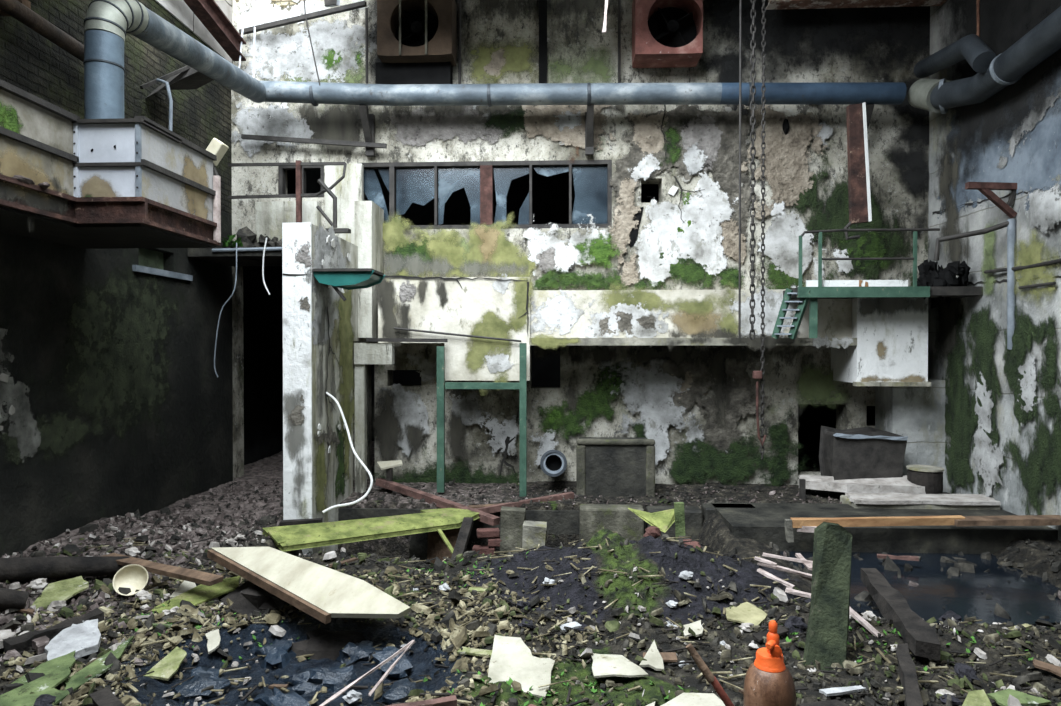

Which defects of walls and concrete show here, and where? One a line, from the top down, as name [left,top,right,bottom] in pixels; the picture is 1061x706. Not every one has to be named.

corrosion [0,151,65,198]
corrosion [81,175,117,197]
corrosion [182,155,209,219]
peeling [937,77,1061,219]
flaking render [521,105,854,464]
peeling [0,328,41,463]
peeling [972,376,1004,500]
peeling [1017,352,1040,427]